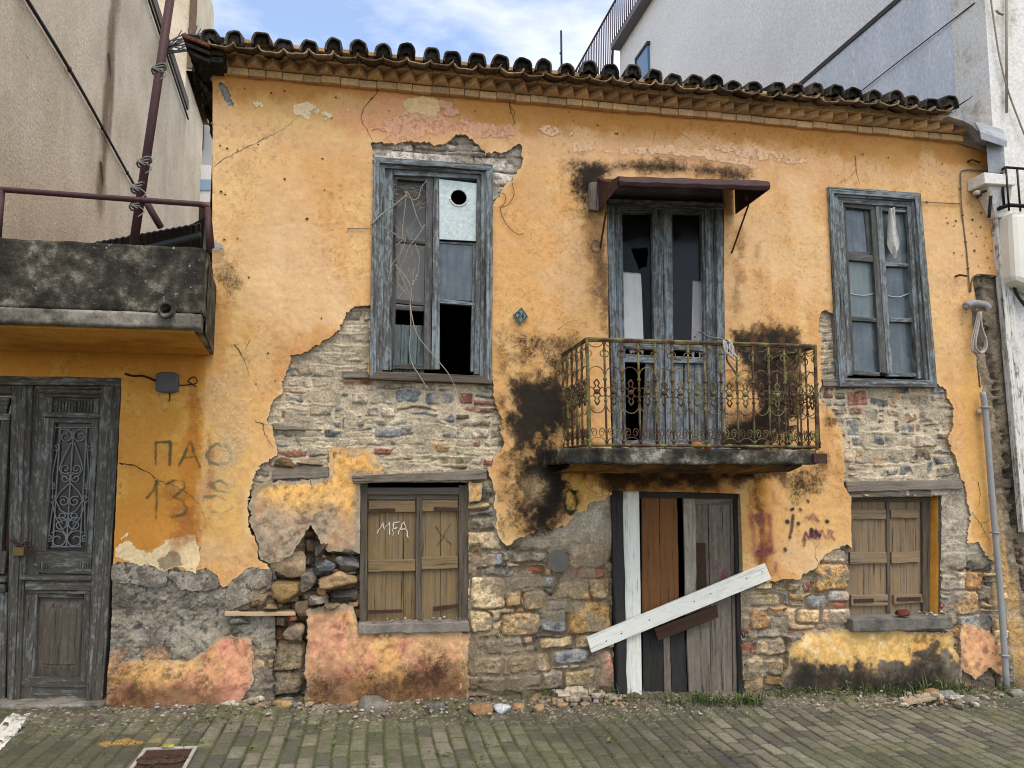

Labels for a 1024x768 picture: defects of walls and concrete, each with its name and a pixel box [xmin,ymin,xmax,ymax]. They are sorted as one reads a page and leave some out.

spalling [371,96,522,203]
damp [569,157,753,213]
crack [119,463,206,550]
spalling [202,306,614,698]
damp [493,329,587,536]
damp [599,443,828,504]
damp [723,316,808,450]
spalling [818,211,1024,688]
spalling [107,526,360,702]
spalling [740,545,850,692]
damp [783,651,947,693]